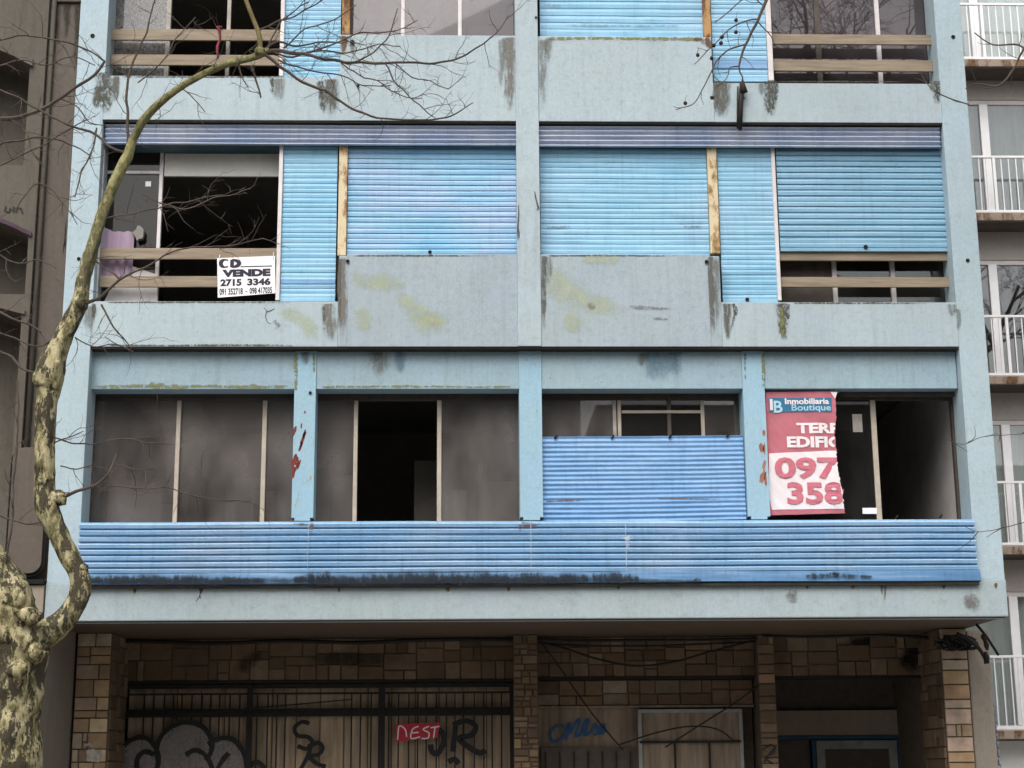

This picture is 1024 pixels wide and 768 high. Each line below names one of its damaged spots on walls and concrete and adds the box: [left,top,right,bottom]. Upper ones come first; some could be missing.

damp [93,72,119,109]
damp [500,37,515,99]
damp [540,39,551,86]
damp [713,81,729,114]
damp [759,81,778,113]
damp [541,256,551,317]
damp [708,256,738,337]
damp [777,303,790,338]